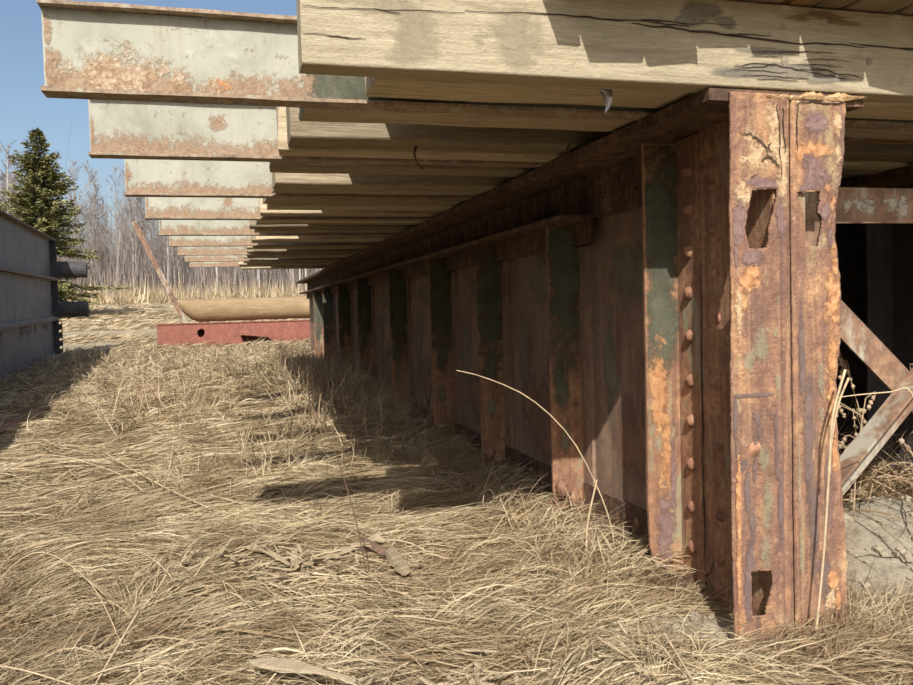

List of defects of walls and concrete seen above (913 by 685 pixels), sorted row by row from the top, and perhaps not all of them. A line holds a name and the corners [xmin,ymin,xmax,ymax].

corrosion [43,17,61,85]
corrosion [90,115,284,266]
corrosion [209,72,318,98]
crack [302,5,913,178]
corrosion [734,103,842,210]
corrosion [524,318,551,460]
corrosion [614,334,677,569]
corrosion [734,264,763,339]
corrosion [824,244,840,471]